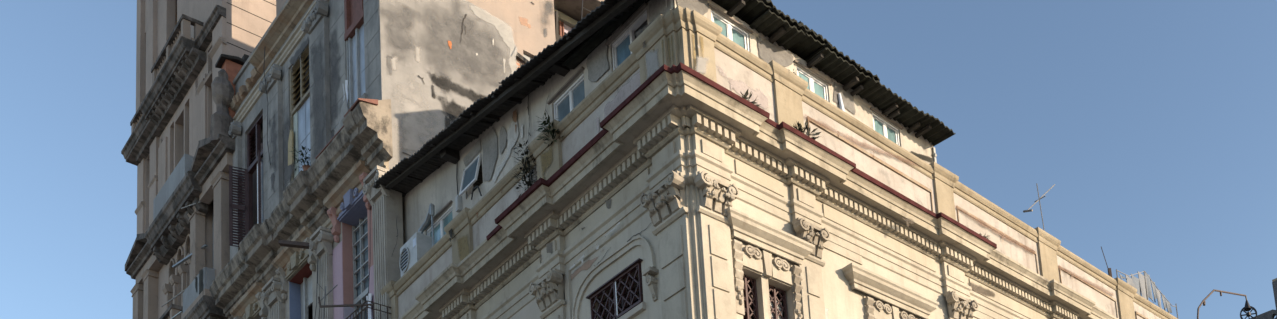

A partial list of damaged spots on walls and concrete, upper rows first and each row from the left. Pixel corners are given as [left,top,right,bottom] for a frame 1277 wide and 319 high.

water stain [387,8,412,74]
water stain [427,4,503,128]